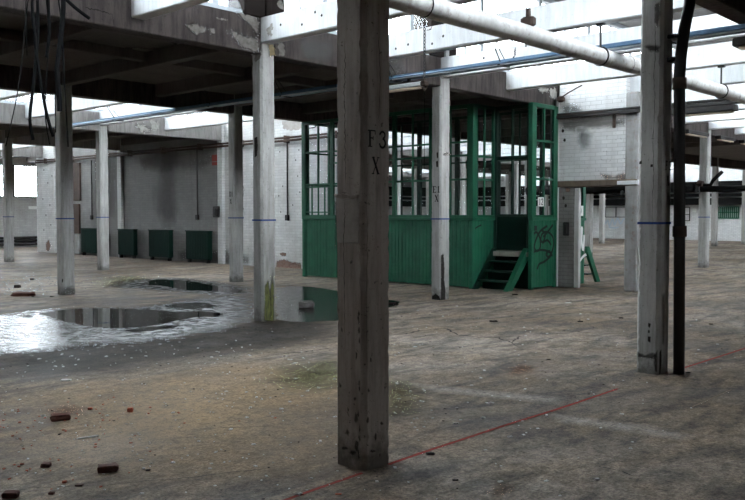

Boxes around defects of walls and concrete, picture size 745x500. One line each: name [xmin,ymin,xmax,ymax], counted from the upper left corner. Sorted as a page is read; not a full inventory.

peeling [187,24,215,35]
peeling [232,13,281,62]
water stain [0,277,338,389]
crack [390,329,520,346]